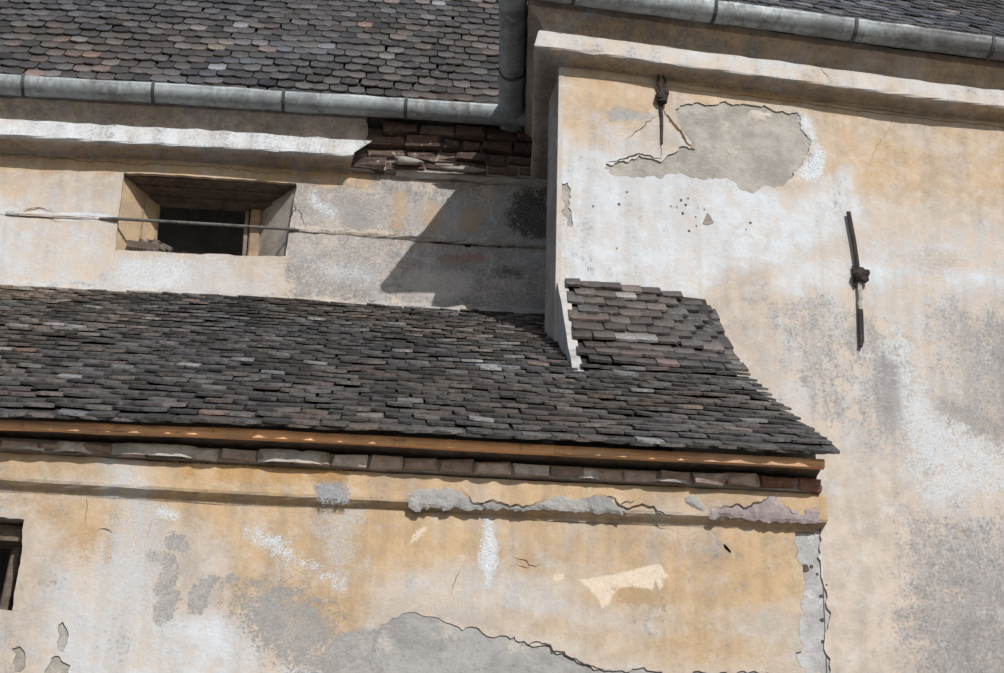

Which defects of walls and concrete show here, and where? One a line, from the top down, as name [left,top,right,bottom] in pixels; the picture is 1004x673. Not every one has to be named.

flaking render [605,101,820,193]
crack [569,75,1002,159]
mould [500,185,547,252]
flaking render [671,198,714,232]
water stain [871,284,1004,520]
flaking render [145,530,670,673]
flaking render [795,530,831,673]
flaking render [12,647,26,672]
flaking render [44,622,70,673]